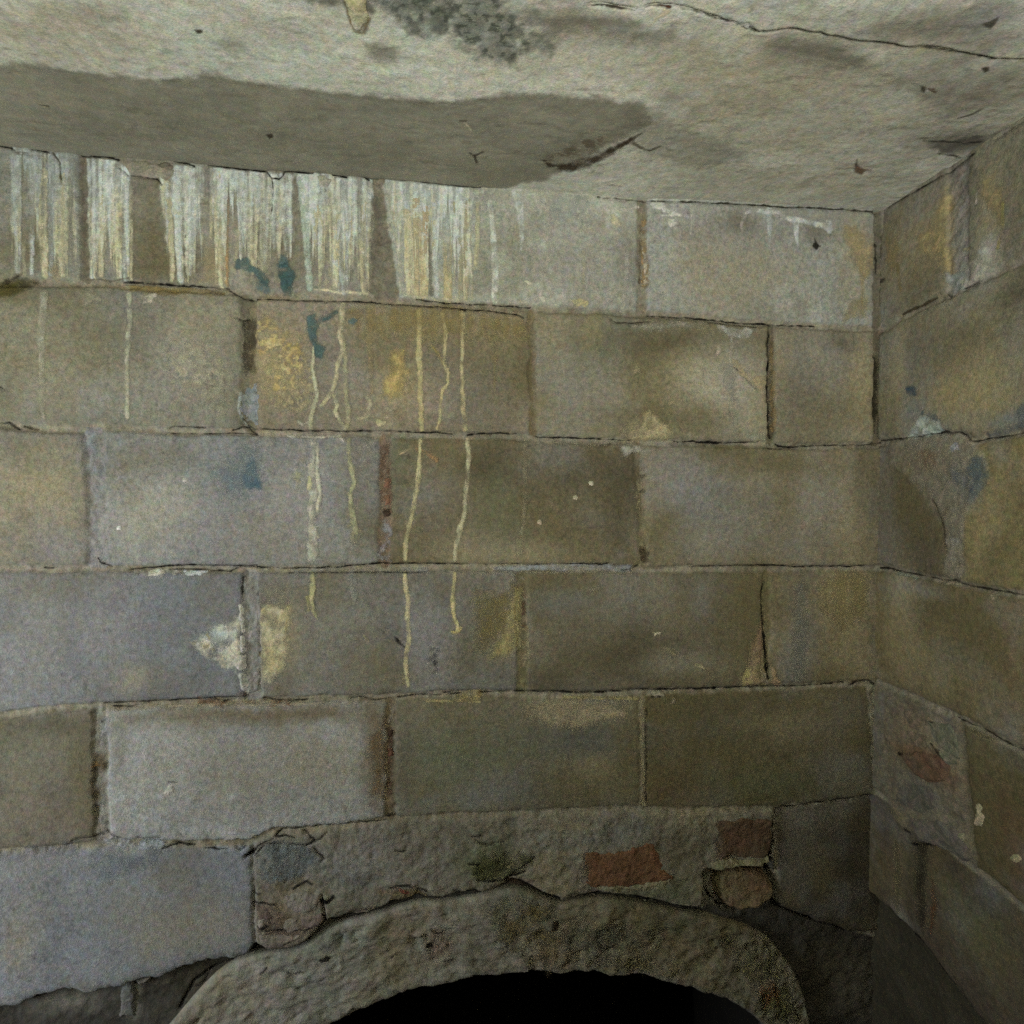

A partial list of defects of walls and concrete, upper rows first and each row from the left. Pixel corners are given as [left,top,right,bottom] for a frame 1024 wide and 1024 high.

damp [319,0,554,59]
crack [591,4,671,22]
crack [875,41,995,59]
damp [543,191,709,268]
damp [0,63,650,687]
damp [603,412,670,454]
crack [357,564,1022,700]
crack [104,695,314,710]